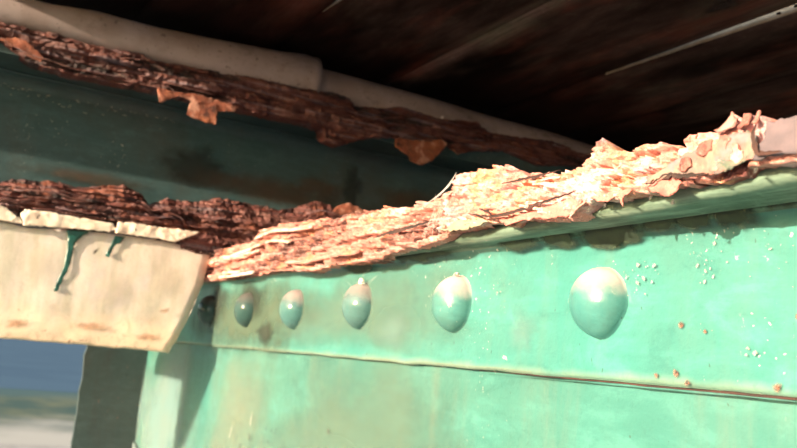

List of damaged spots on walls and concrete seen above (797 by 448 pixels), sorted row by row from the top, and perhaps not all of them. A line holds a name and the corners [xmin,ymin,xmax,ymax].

corrosion [0,37,44,62]
corrosion [157,87,238,125]
corrosion [395,138,472,165]
peeling [646,110,797,205]
damp [170,151,333,203]
corrosion [436,134,705,237]
corrosion [333,203,364,215]